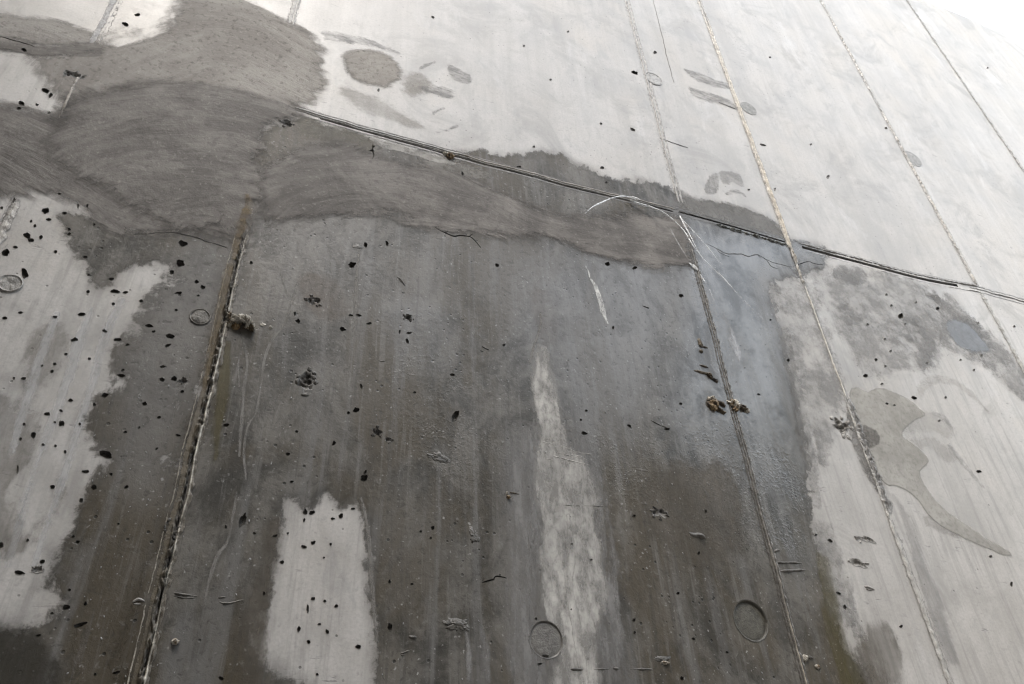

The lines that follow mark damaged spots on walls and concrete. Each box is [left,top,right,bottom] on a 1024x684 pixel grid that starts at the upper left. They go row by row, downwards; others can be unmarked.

crack [708,244,823,269]